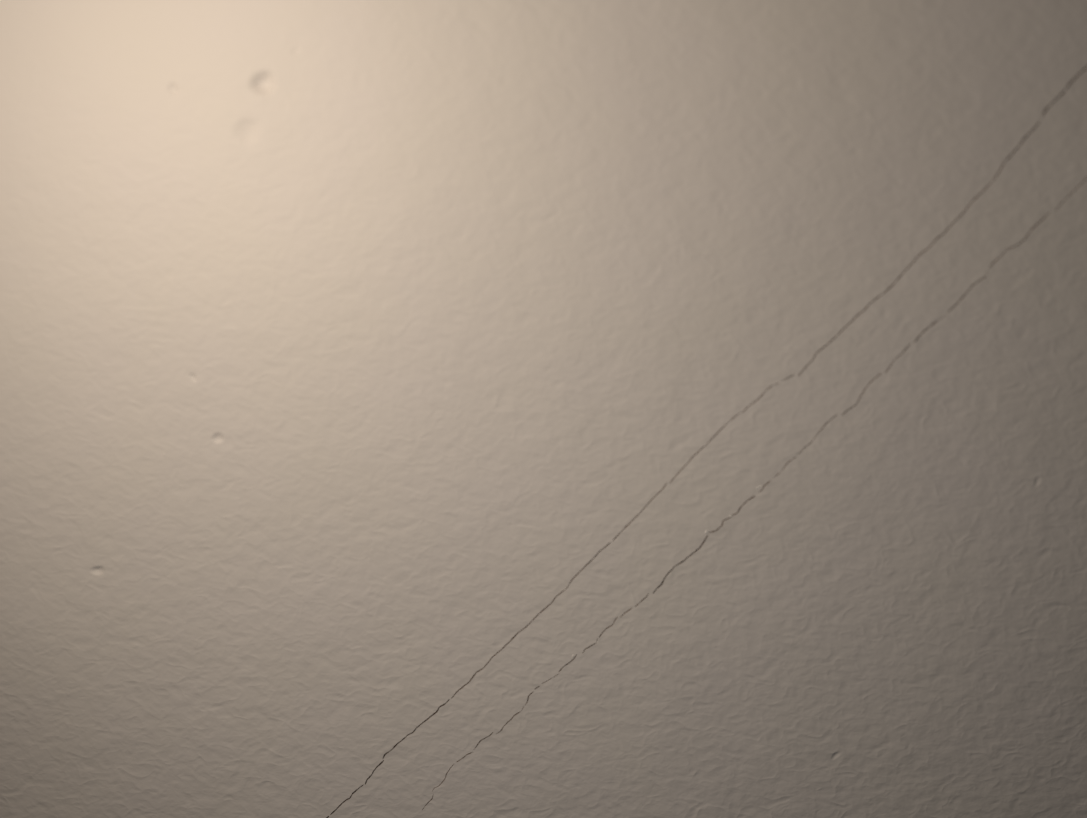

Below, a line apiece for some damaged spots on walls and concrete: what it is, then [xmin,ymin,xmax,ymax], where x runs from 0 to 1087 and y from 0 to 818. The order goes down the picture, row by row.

crack [326,66,1087,818]